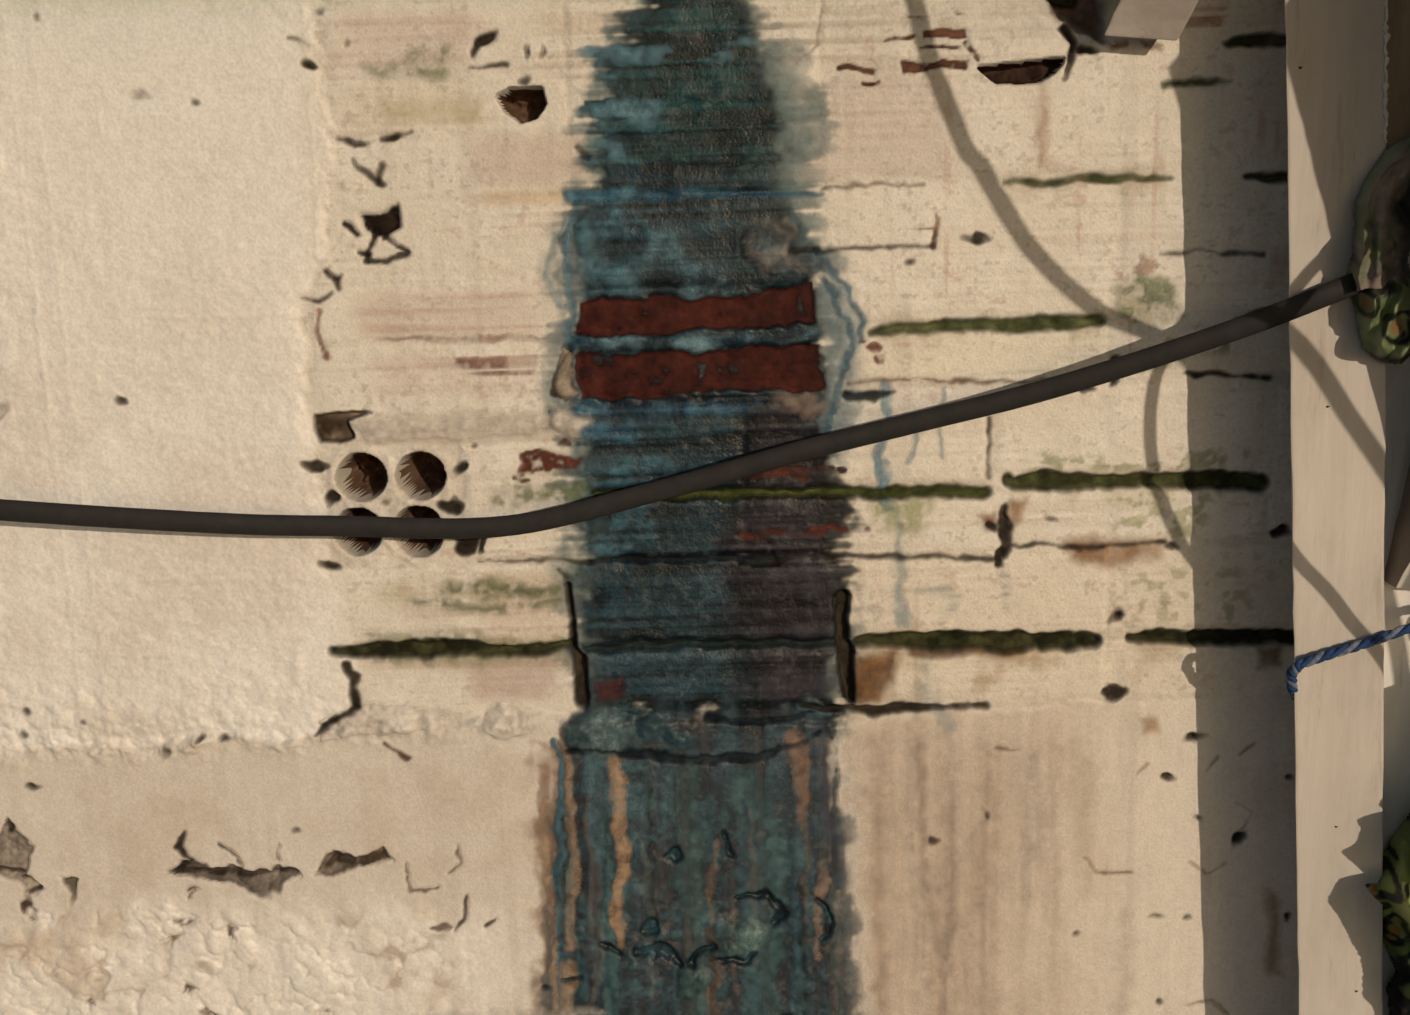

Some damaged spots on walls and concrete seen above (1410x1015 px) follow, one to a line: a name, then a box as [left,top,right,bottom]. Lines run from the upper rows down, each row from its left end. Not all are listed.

crack [338,134,402,187]
crack [308,270,341,303]
leakage [553,0,866,503]
peeling [552,282,825,402]
leakage [874,441,891,511]
crack [316,417,1294,764]
leakage [538,455,858,1015]
spalling [0,819,43,893]
spalling [64,877,78,900]
spalling [169,831,299,897]
spalling [319,847,390,875]